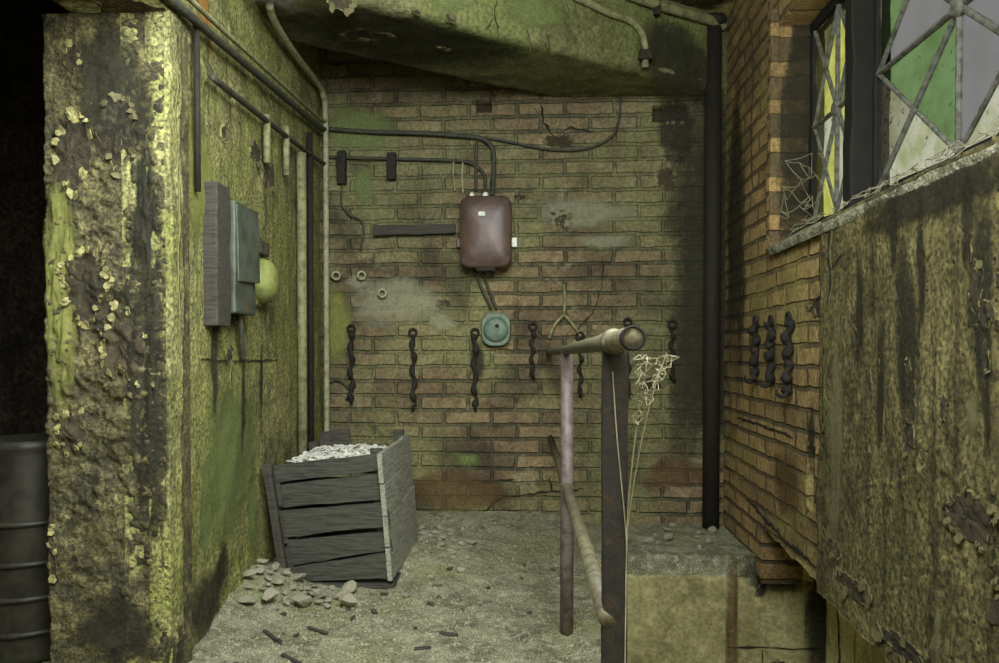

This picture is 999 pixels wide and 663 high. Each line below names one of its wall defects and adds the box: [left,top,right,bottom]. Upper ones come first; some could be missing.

water stain [76,32,169,552]
water stain [645,22,707,449]
water stain [829,315,843,553]
water stain [871,156,999,453]
water stain [930,609,943,660]